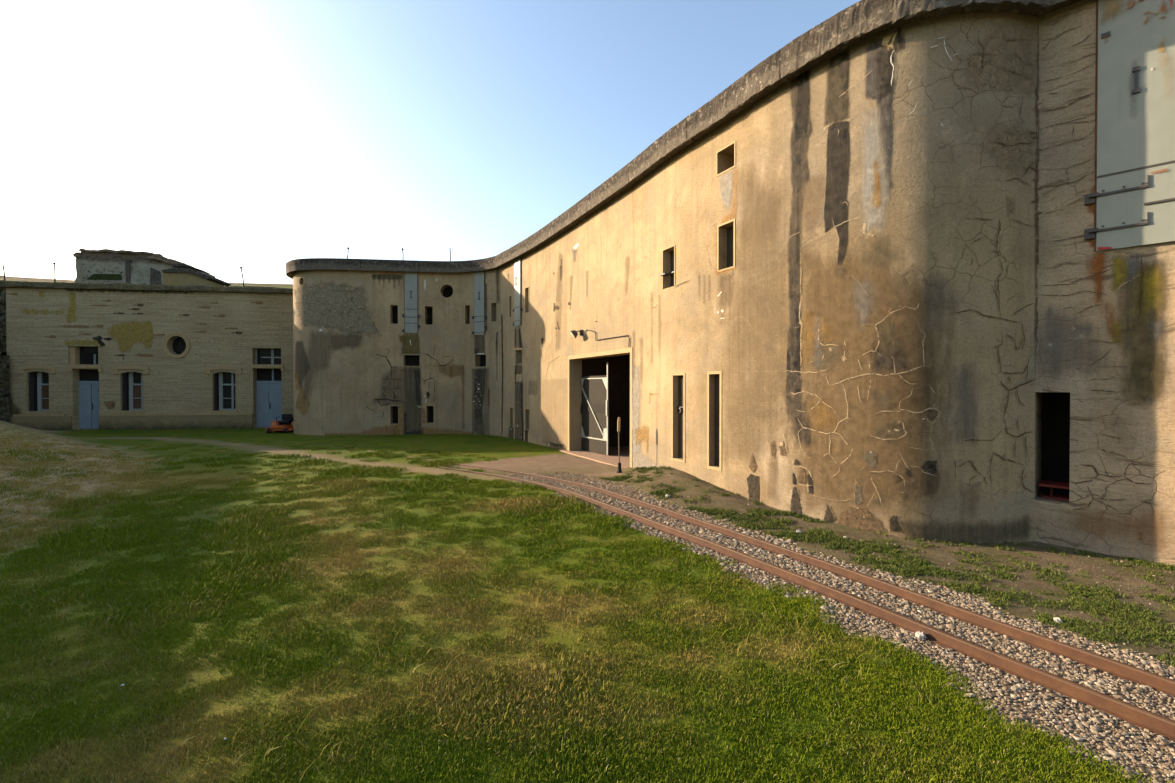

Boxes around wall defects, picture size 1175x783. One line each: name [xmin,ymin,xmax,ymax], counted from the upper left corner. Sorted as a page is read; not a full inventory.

leakage [786,27,936,510]
crack [728,18,1153,517]
peeling [294,282,379,336]
leakage [294,335,359,414]
leakage [908,519,1029,544]